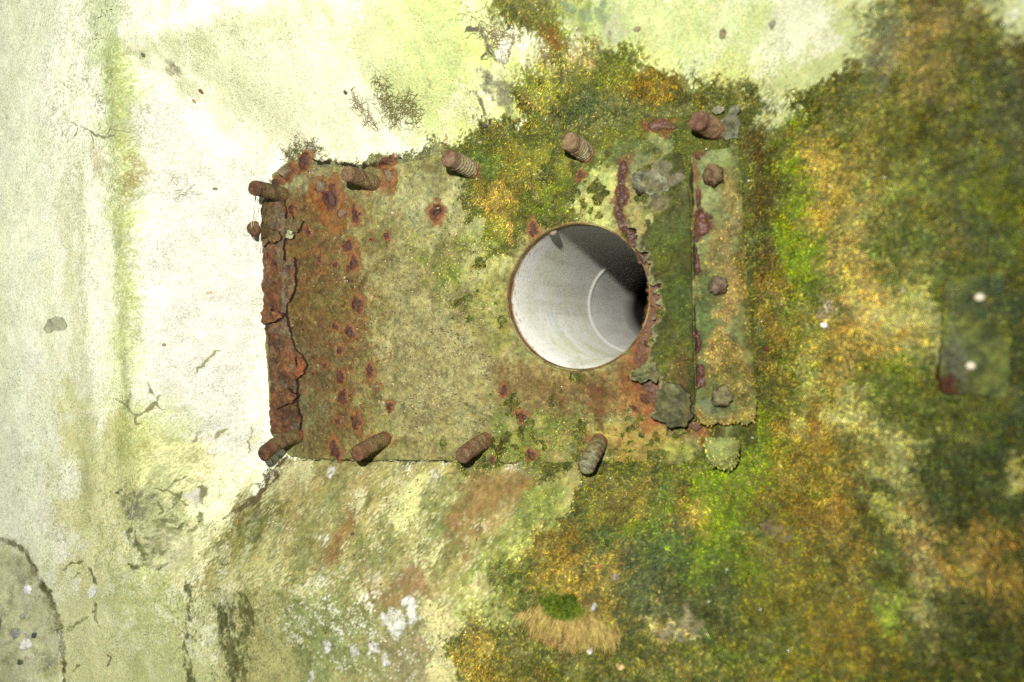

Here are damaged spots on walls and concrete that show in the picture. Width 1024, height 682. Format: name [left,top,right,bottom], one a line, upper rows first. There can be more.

corrosion [262,173,391,276]
corrosion [694,188,710,274]
corrosion [260,257,298,324]
corrosion [548,160,702,443]
peeling [626,152,697,428]
crack [115,382,162,425]
corrosion [271,289,367,463]
corrosion [365,358,395,415]
crack [2,538,101,682]